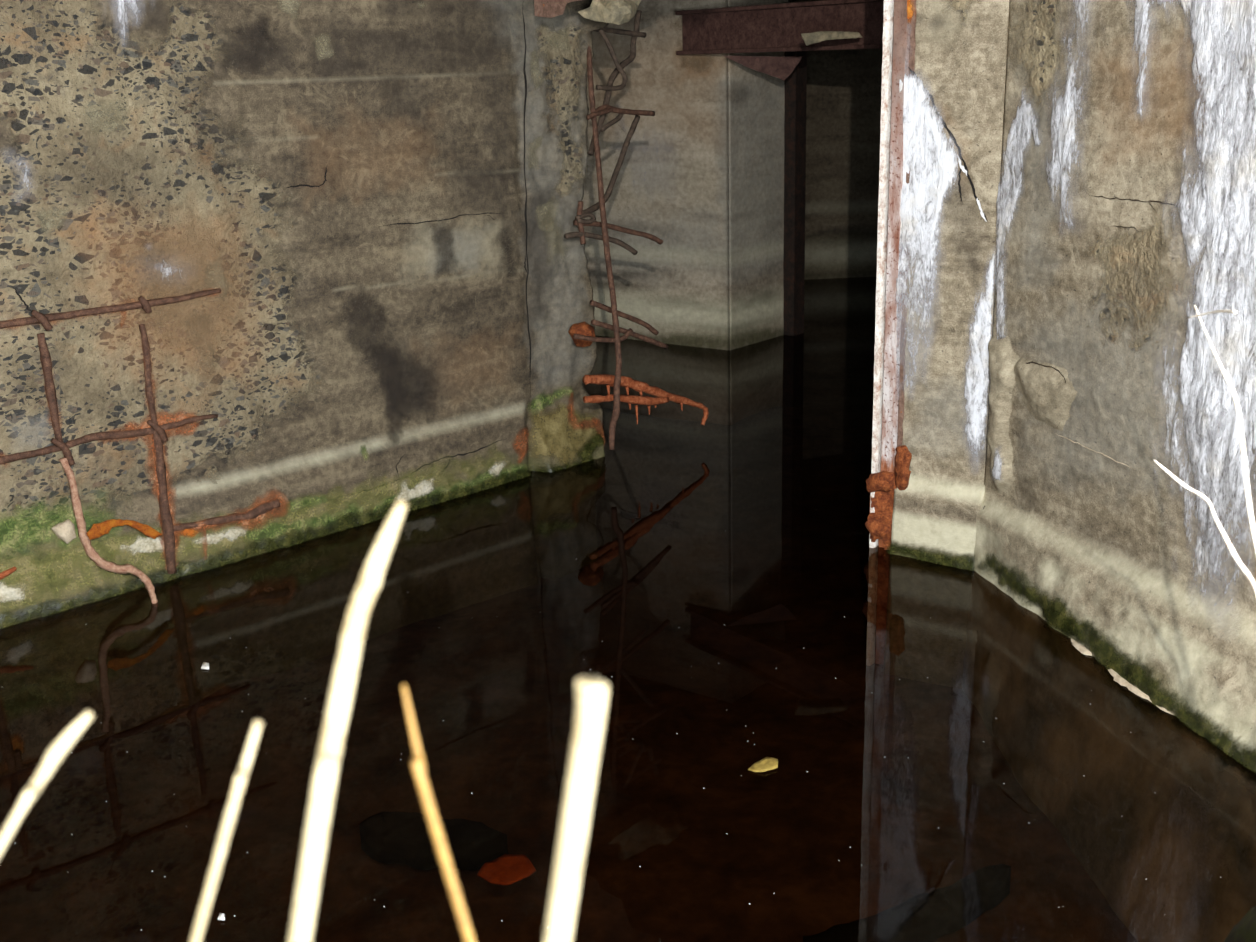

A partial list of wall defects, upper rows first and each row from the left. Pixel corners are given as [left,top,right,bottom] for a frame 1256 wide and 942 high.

damp [117,0,139,38]
damp [896,74,958,387]
damp [964,0,1089,480]
damp [1134,0,1256,601]
corrosion [86,413,287,567]
corrosion [869,472,897,550]
damp [1071,638,1092,656]
damp [1108,669,1173,715]